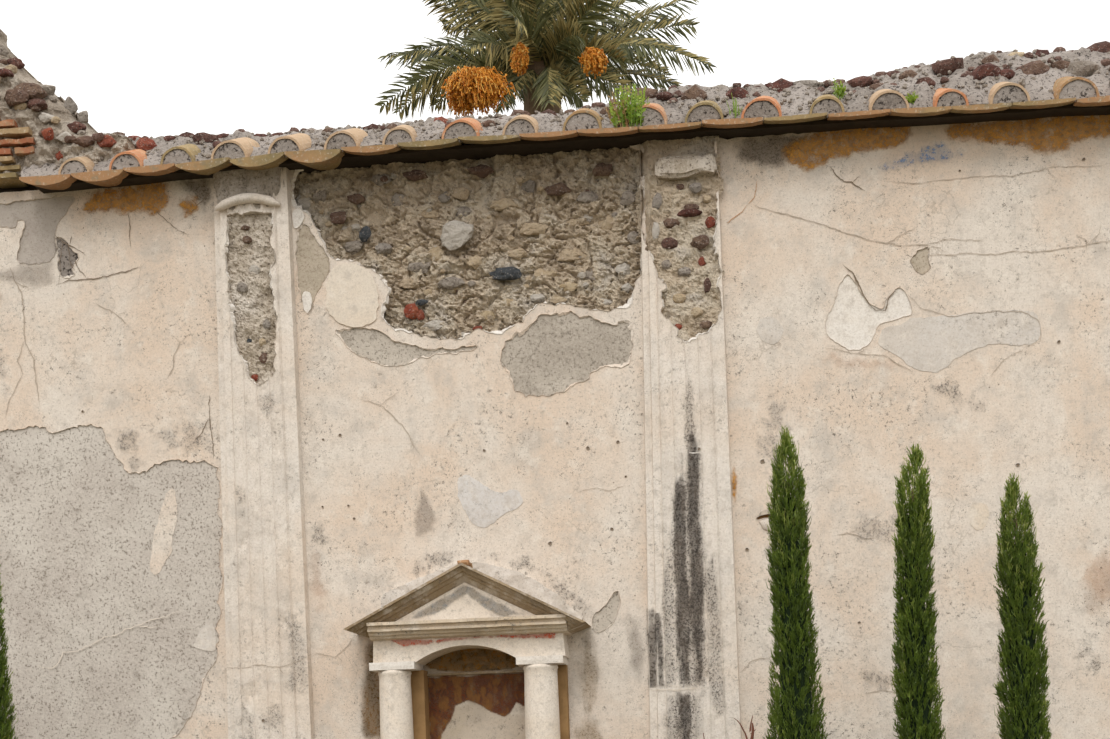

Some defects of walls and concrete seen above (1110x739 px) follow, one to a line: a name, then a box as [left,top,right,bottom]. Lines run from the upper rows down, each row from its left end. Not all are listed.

crack [5,269,40,417]
flaking render [0,165,79,279]
water stain [83,180,209,217]
spalling [224,214,277,386]
spalling [291,125,725,397]
flaking render [825,274,912,350]
crack [728,183,1107,256]
water stain [739,115,1110,170]
crack [847,268,1041,373]
crack [831,163,1109,191]
flaking render [0,410,224,739]
water stain [647,384,724,739]